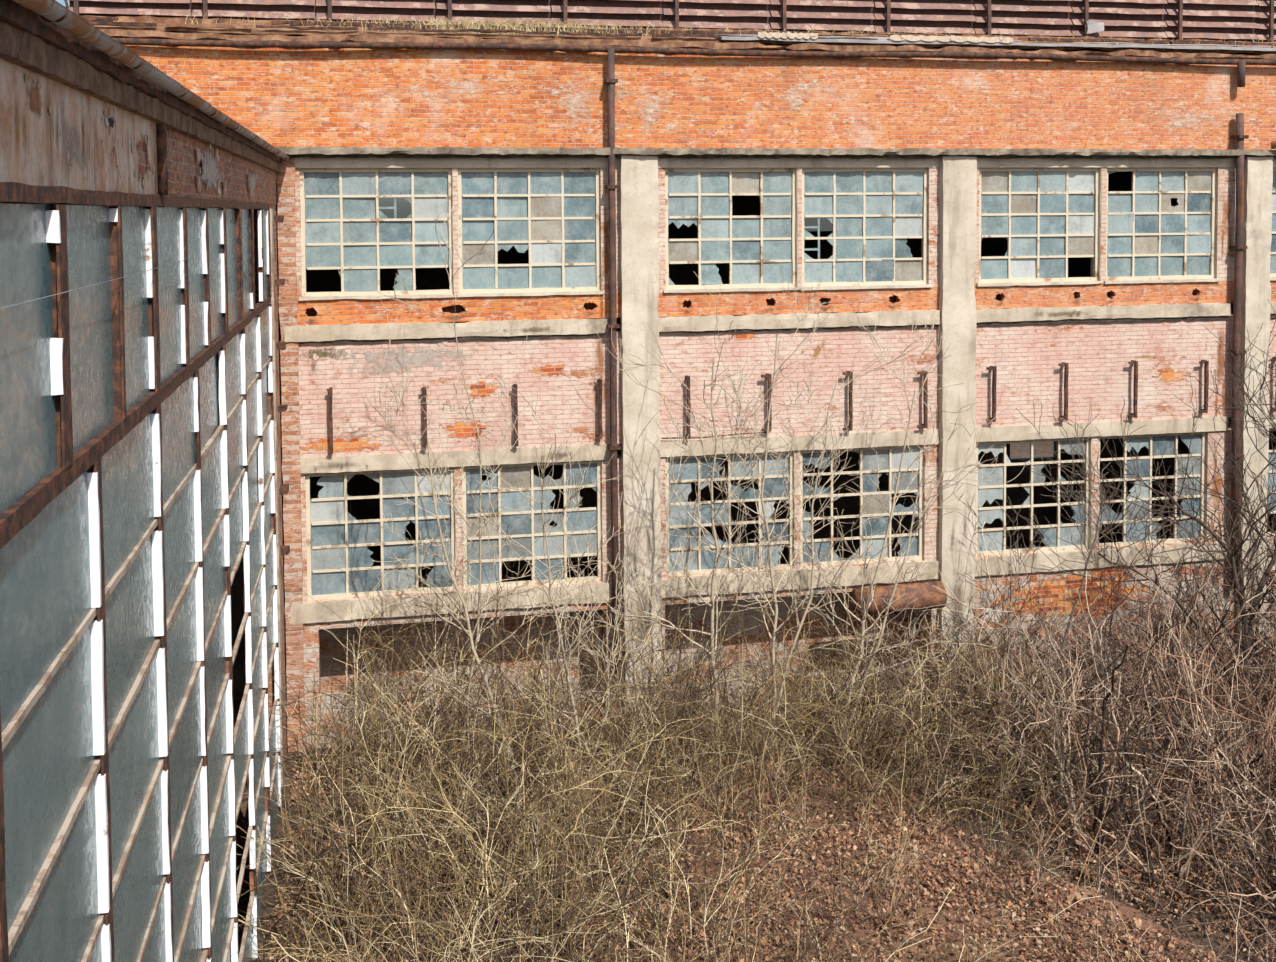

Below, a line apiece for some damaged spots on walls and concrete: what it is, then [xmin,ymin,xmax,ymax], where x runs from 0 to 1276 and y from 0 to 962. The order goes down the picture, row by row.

flaking render [197,144,226,195]
rust [1222,180,1244,252]
flaking render [439,380,499,441]